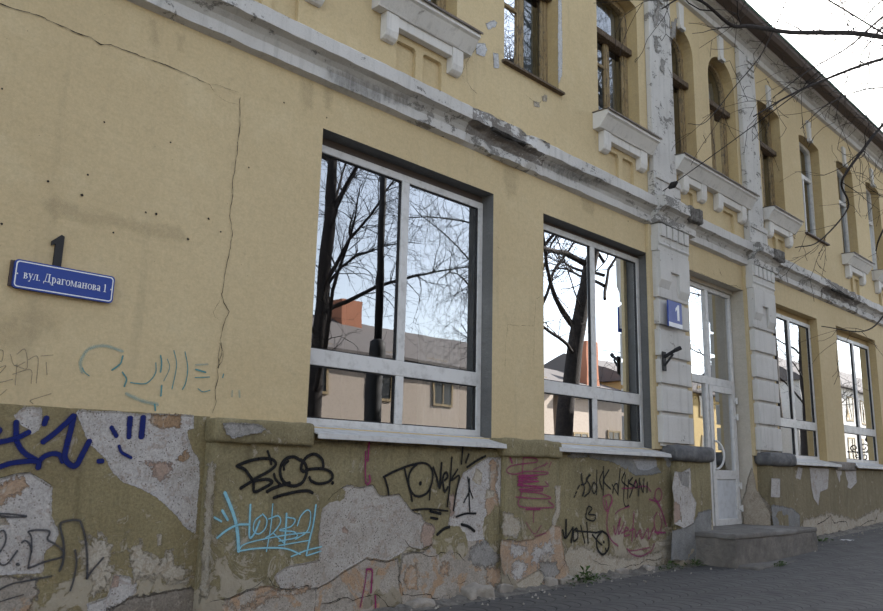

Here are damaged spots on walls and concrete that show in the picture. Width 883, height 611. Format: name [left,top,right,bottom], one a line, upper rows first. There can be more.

crack [0,3,241,105]
peeling [652,1,665,74]
crack [212,127,240,413]
peeling [14,407,43,434]
peeling [223,422,266,439]
peeling [0,473,59,611]
peeling [73,409,217,611]
peeling [222,457,672,611]
peeling [672,468,696,528]
spalling [796,467,883,536]